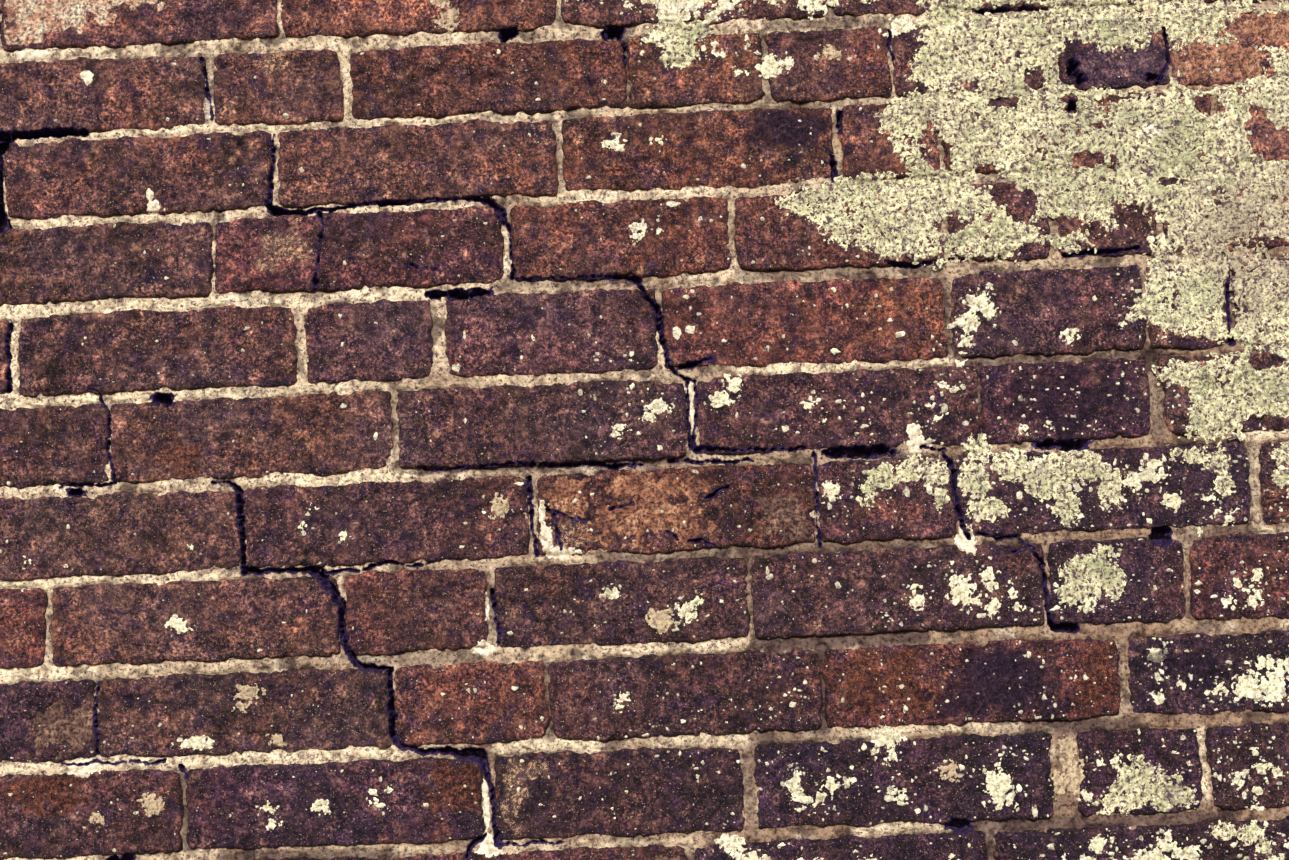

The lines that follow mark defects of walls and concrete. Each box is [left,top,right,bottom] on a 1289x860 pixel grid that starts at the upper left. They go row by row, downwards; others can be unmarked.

crack [0,126,89,233]
crack [263,134,822,557]
crack [211,480,567,860]